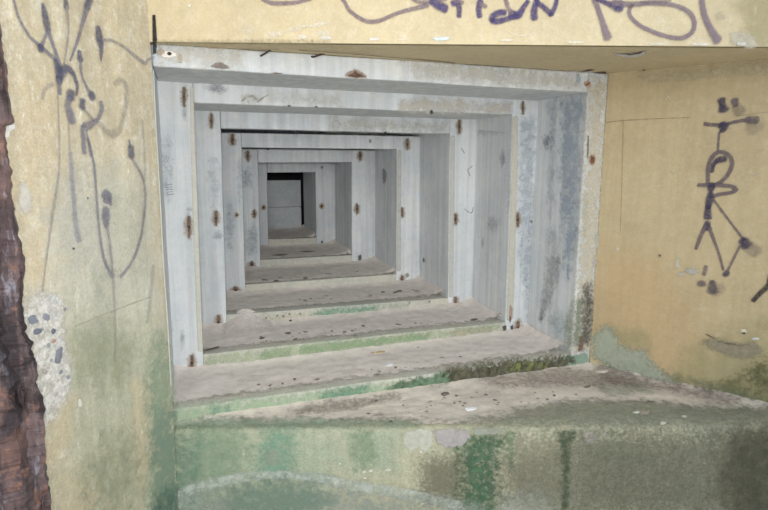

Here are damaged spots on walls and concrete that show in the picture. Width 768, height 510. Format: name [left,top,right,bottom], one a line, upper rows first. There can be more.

corrosion [346,70,366,79]
water stain [560,99,583,271]
water stain [573,284,593,351]
spalling [23,290,72,428]
water stain [177,431,548,510]